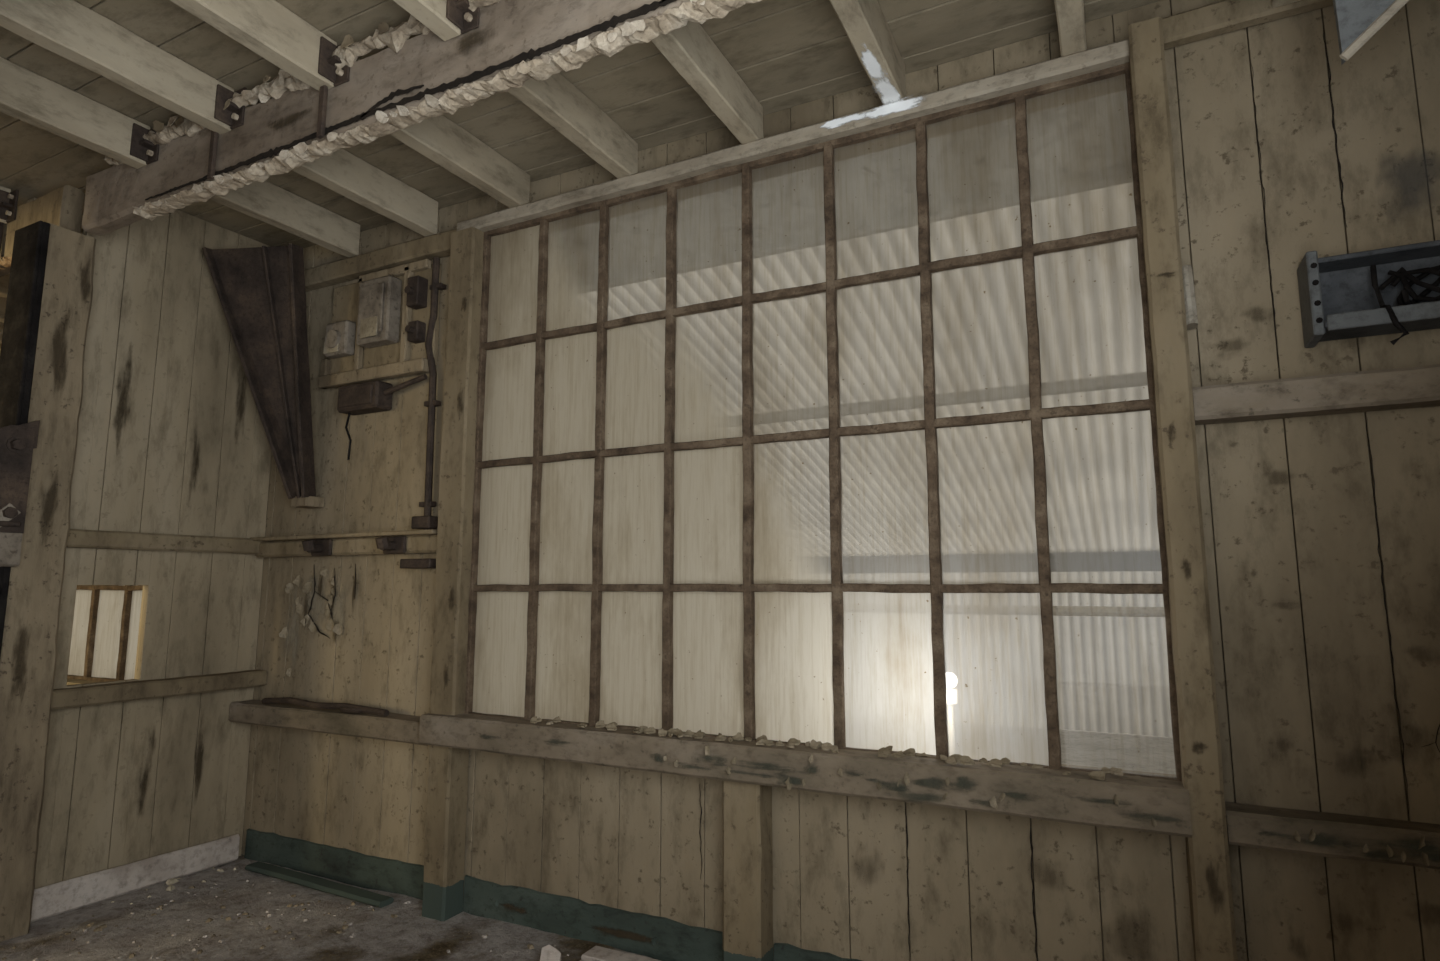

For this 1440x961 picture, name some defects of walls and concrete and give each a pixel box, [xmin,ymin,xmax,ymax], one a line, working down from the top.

crack [145,0,677,200]